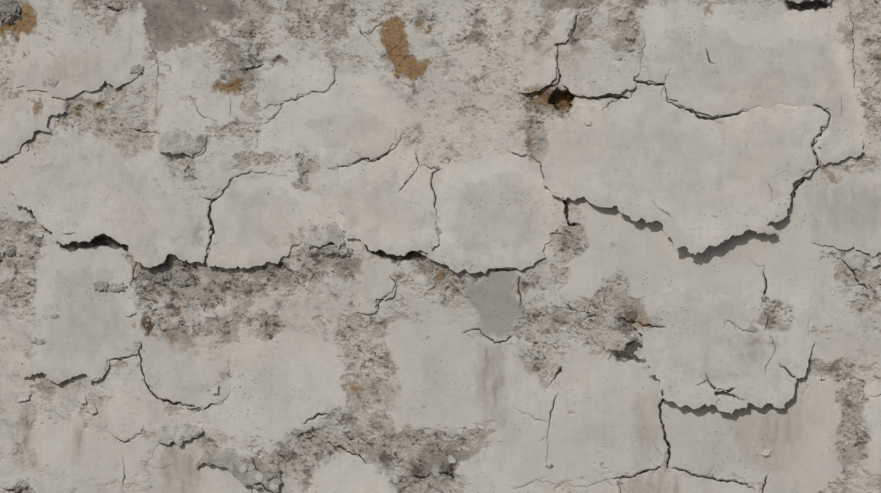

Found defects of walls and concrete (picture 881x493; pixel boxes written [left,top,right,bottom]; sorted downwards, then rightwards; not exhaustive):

rust [0,3,37,40]
spalling [77,0,363,95]
rust [379,16,431,86]
peeling [538,0,647,97]
crack [199,171,275,258]
crack [336,133,440,225]
peeling [0,23,864,409]
crack [105,344,213,411]
spalling [153,276,469,493]
crack [516,367,561,460]
crack [568,389,768,493]
peeling [512,270,871,493]